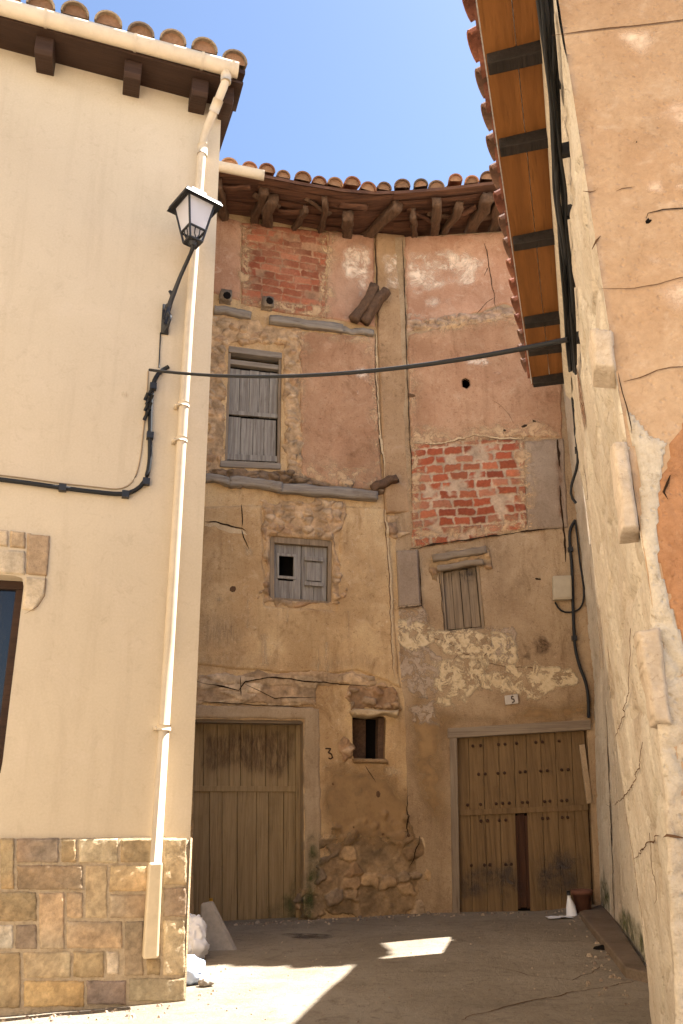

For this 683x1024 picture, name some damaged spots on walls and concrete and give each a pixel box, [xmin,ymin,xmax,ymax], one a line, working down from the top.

crack [402,241,524,496]
crack [204,504,249,548]
flaking render [386,429,527,548]
peeling [656,423,683,641]
crack [200,677,366,708]
flaking render [338,737,356,762]
peeling [196,604,578,724]
crack [605,628,683,925]